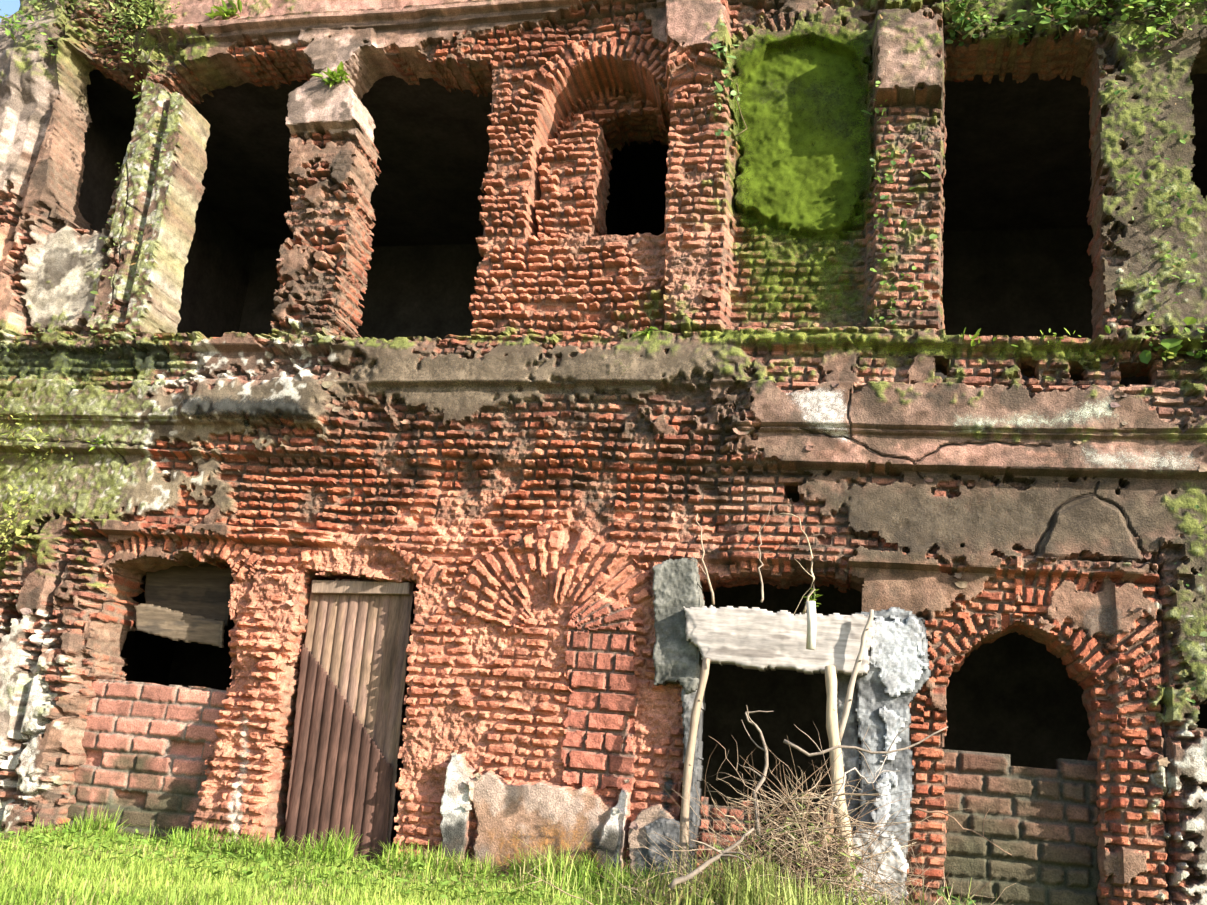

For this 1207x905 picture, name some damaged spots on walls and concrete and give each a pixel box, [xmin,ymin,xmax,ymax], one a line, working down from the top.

spalling [270,199,353,336]
damp [0,342,170,406]
crack [800,392,1050,479]
damp [18,678,51,804]
spalling [222,376,1207,888]
crack [1033,486,1173,905]